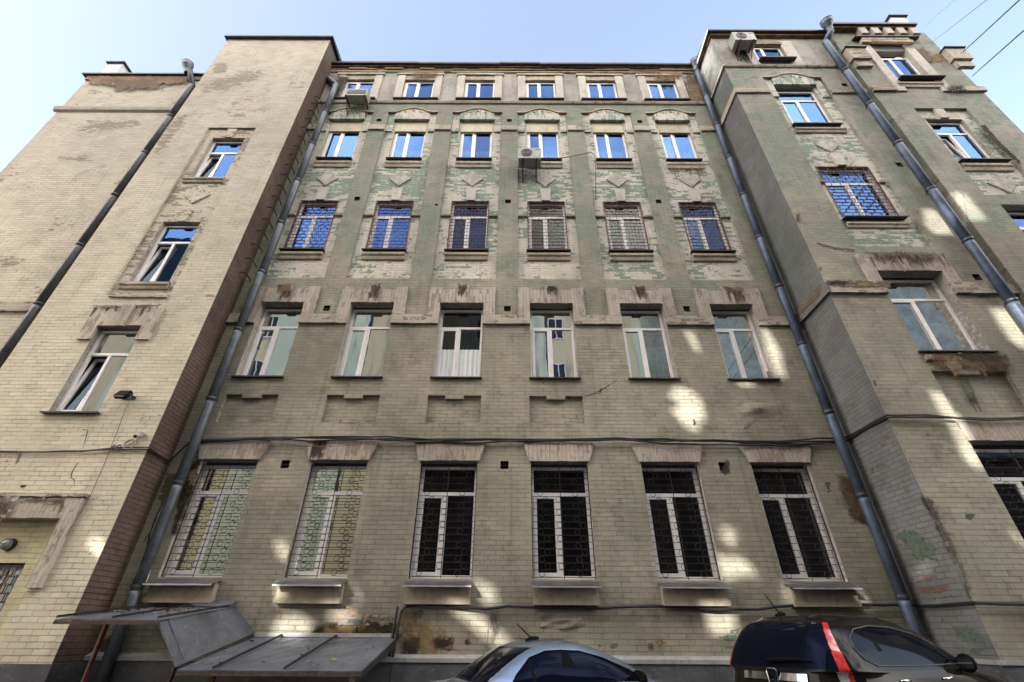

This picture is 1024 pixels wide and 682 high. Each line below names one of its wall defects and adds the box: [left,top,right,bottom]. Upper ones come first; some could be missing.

flaking render [88,75,189,91]
water stain [838,476,868,525]
water stain [401,611,445,654]